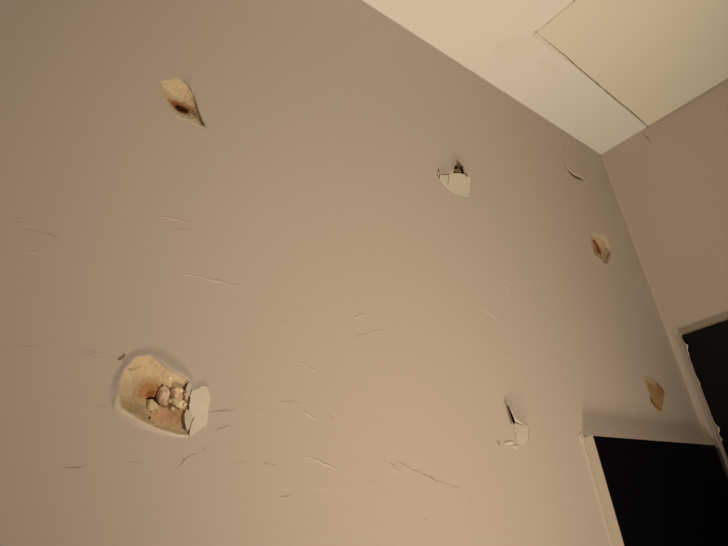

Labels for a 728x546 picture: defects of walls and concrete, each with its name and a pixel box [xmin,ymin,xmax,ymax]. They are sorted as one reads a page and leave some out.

spalling [160,74,209,128]
hole [436,149,470,196]
spalling [589,231,612,264]
spalling [108,347,210,438]